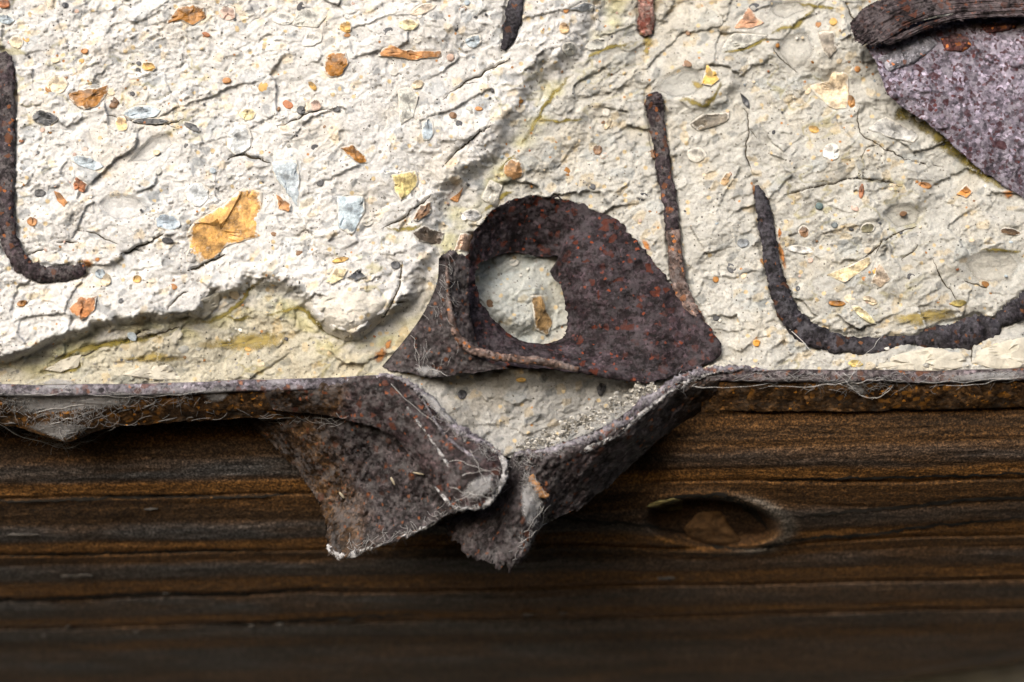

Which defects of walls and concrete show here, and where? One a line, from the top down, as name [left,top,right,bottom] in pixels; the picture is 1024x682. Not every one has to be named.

corrosion [980,19,1021,33]
corrosion [878,33,971,72]
crack [444,59,509,99]
crack [227,154,270,163]
crack [785,106,937,195]
crack [27,230,163,255]
crack [79,254,225,357]
peeling [187,293,220,319]
peeling [165,328,183,344]
peeling [45,355,82,372]
peeling [123,364,181,380]
corrosion [528,474,549,499]